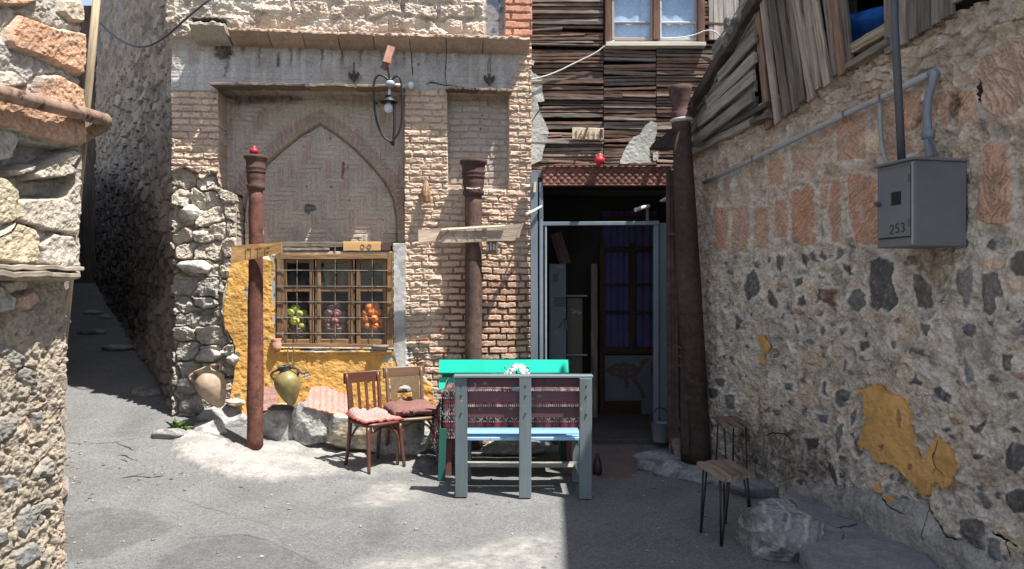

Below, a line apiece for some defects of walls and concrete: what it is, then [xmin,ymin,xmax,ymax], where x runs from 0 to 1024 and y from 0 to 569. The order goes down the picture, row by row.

flaking render [531,59,549,165]
flaking render [619,121,659,164]
peeling [757,334,771,365]
peeling [856,384,958,497]
crack [882,494,961,540]
crack [992,530,1017,557]